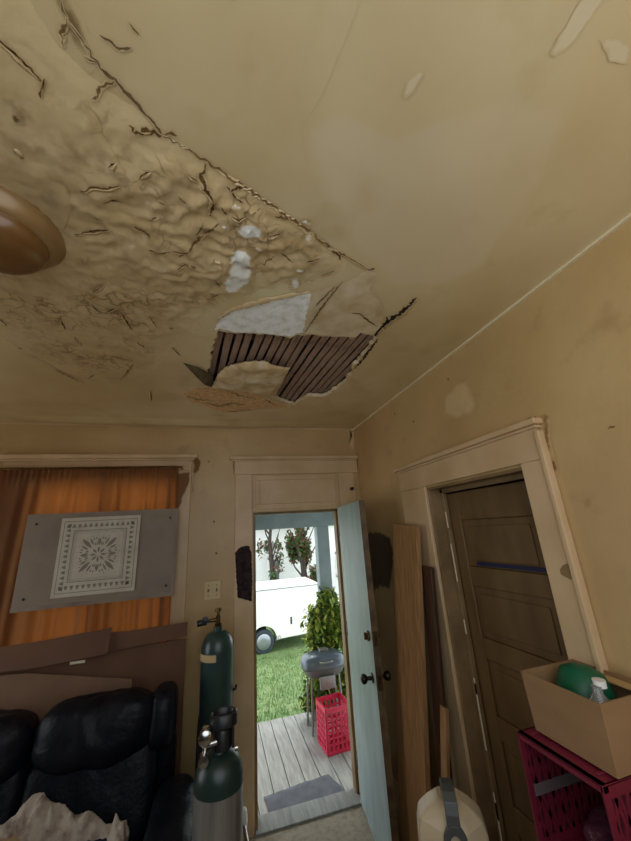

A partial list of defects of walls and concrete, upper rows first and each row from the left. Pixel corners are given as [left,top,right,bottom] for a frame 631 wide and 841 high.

peeling [80,185,121,204]
crack [57,0,375,271]
peeling [148,176,385,414]
crack [354,298,419,369]